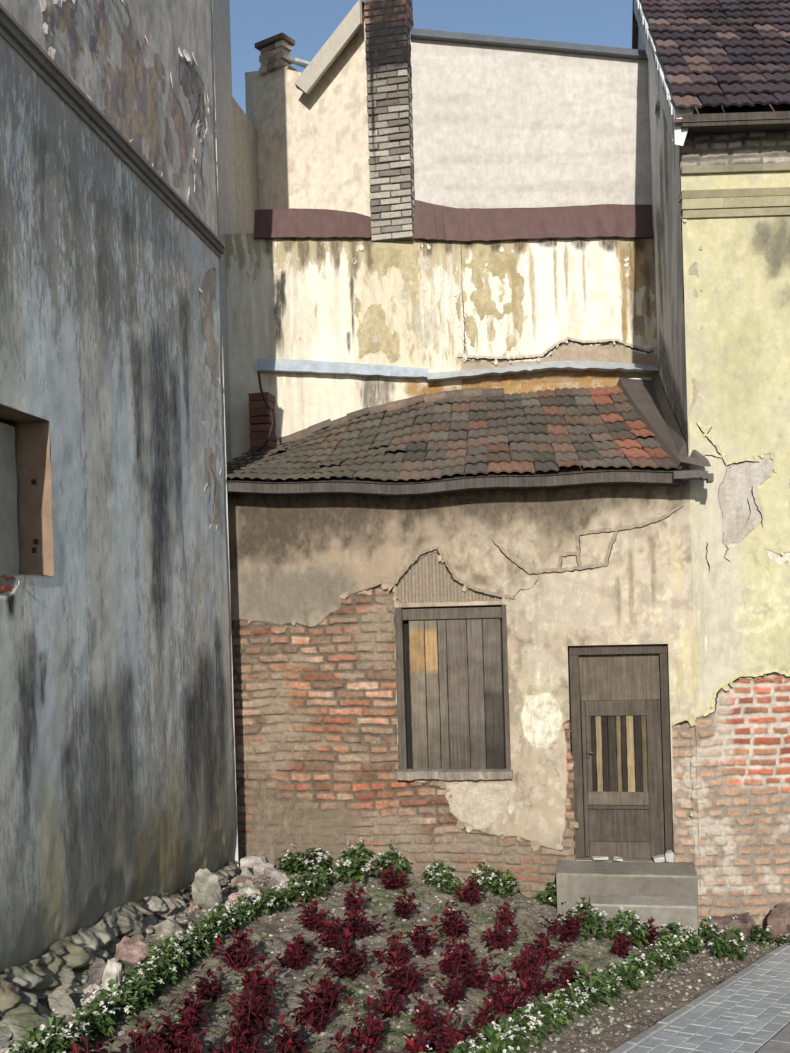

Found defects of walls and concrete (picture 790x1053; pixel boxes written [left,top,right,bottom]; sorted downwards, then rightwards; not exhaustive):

peeling [40,0,209,201]
damp [646,113,667,309]
spalling [452,245,657,388]
crack [457,244,657,362]
crack [365,503,684,601]
crack [696,421,760,466]
spalling [718,452,778,547]
damp [20,643,45,805]
damp [63,673,135,913]
damp [183,631,225,805]
flaking render [231,580,579,902]
flaking render [652,674,790,930]